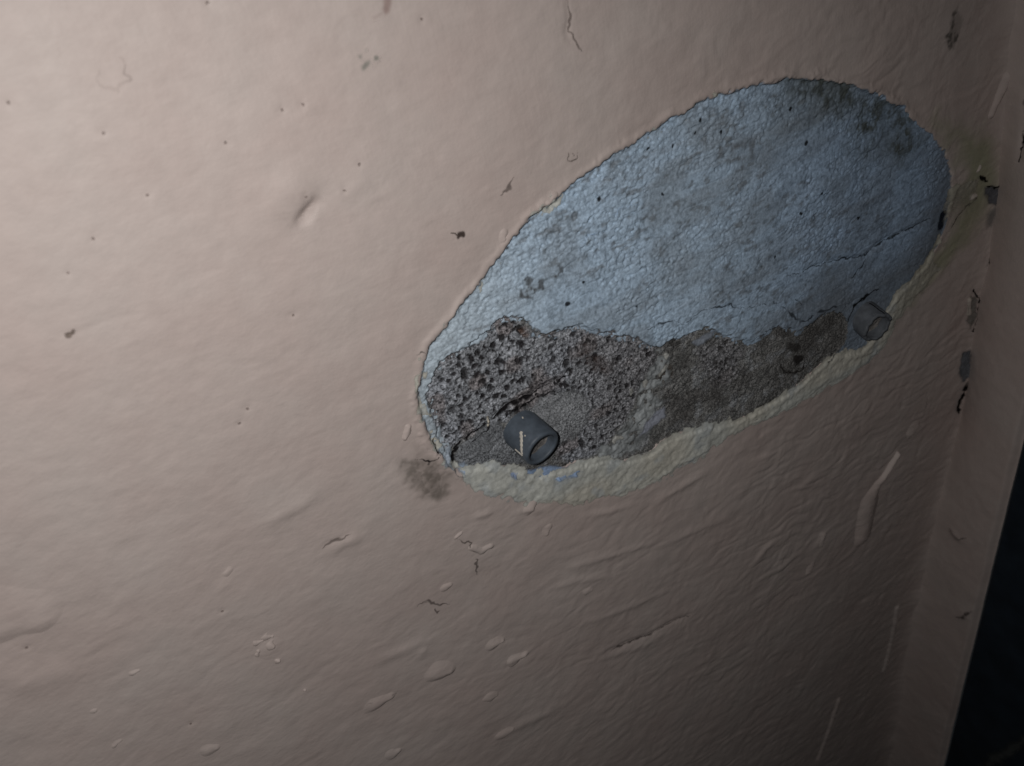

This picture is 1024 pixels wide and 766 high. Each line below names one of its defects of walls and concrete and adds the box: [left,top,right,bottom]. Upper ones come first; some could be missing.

flaking render [414,82,999,507]
crack [648,219,927,330]
damp [392,439,462,506]